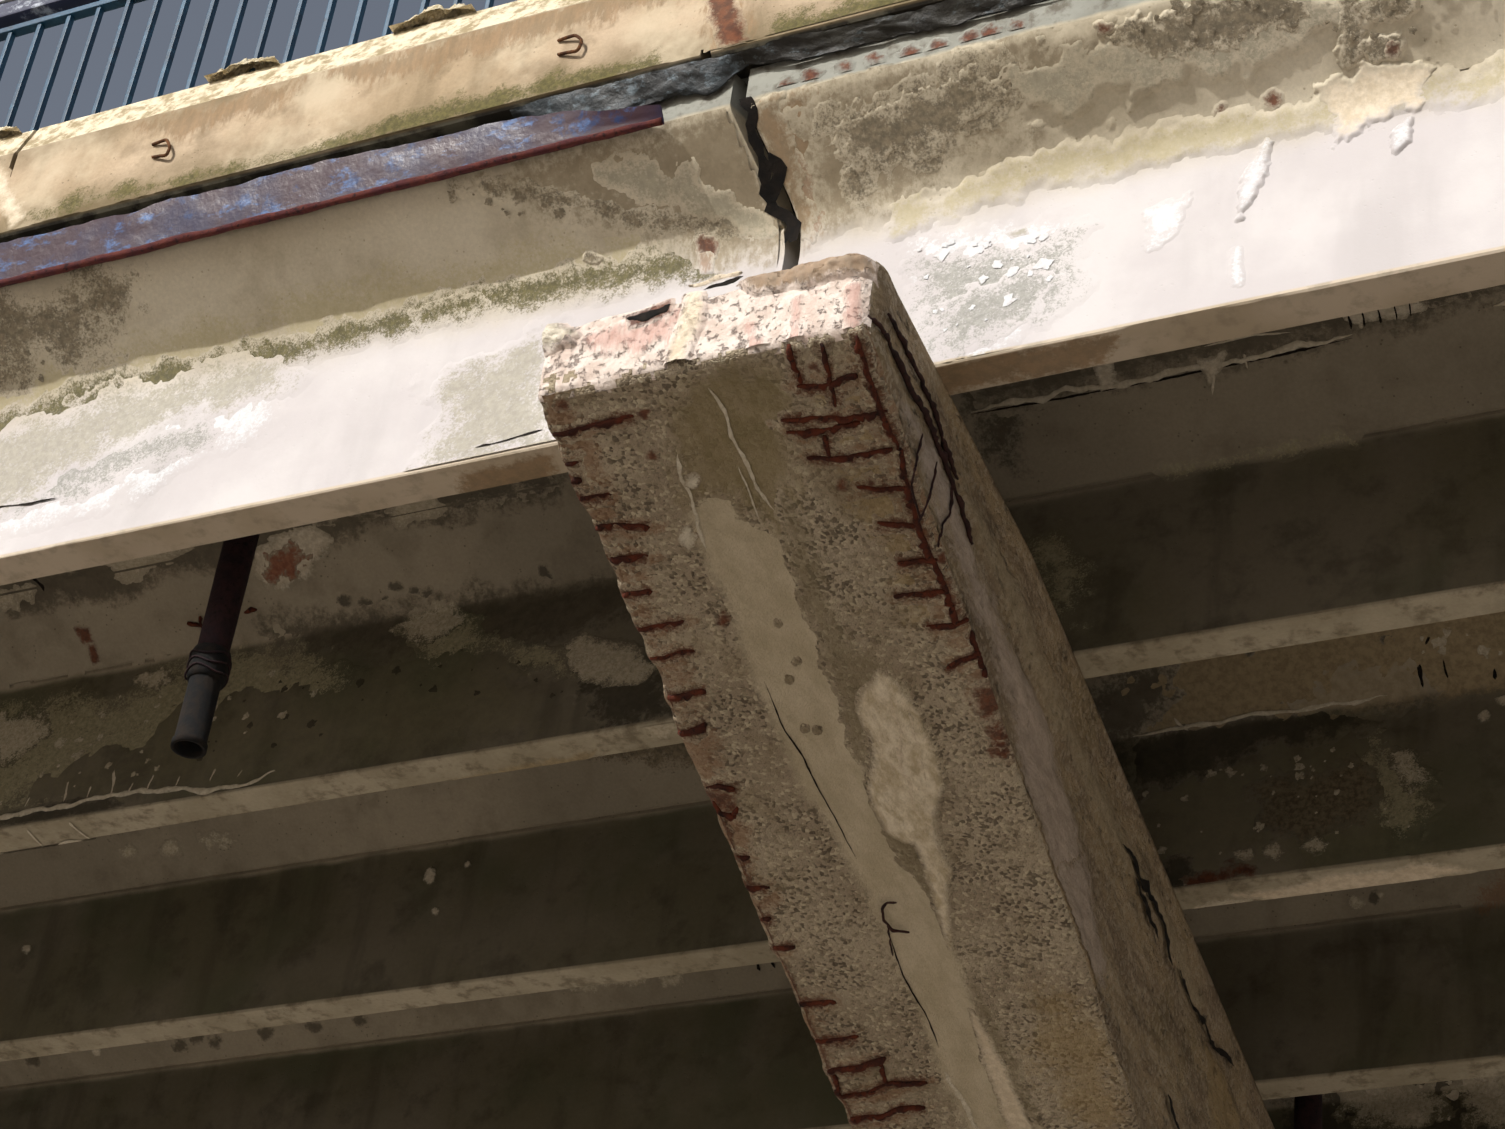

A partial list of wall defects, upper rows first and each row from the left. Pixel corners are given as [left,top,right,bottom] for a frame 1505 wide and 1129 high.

rust [688,0,764,53]
water stain [783,0,1342,241]
water stain [0,107,783,523]
water stain [251,311,576,570]
spalling [576,298,681,360]
crack [971,332,1352,414]
crack [0,769,275,827]
spalling [444,747,602,781]
spalling [541,389,946,1129]
water stain [647,291,1137,1129]
spalling [765,203,1505,1017]
crack [1123,844,1234,1066]